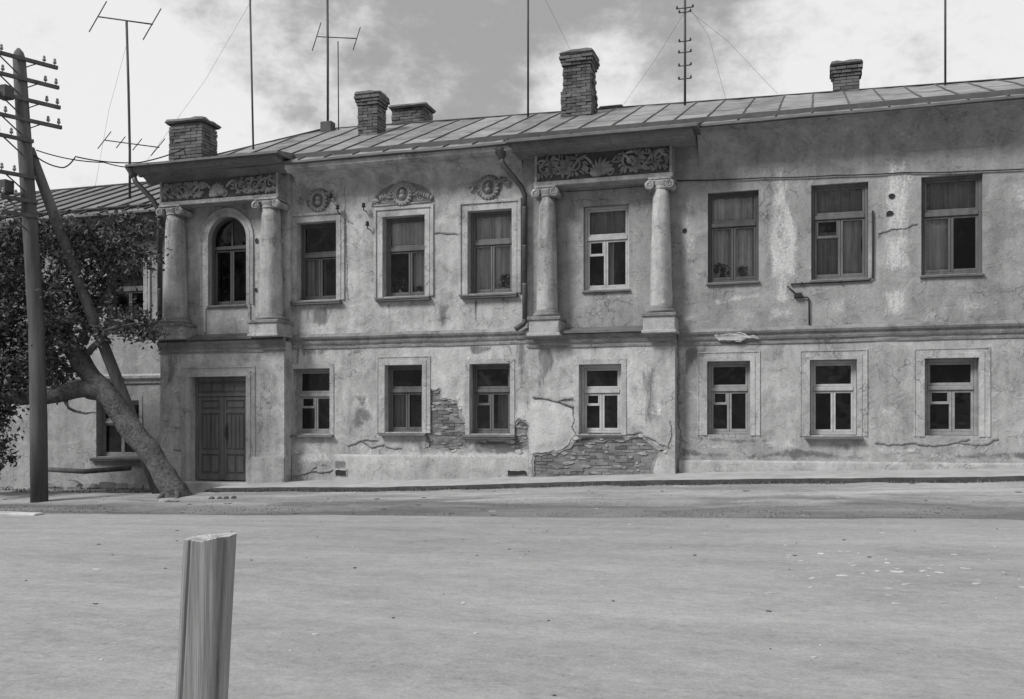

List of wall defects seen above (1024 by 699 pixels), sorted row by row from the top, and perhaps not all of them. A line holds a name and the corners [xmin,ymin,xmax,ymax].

crack [878,222,918,234]
crack [532,395,576,434]
spalling [425,386,667,477]
crack [348,437,402,449]
crack [875,437,999,447]